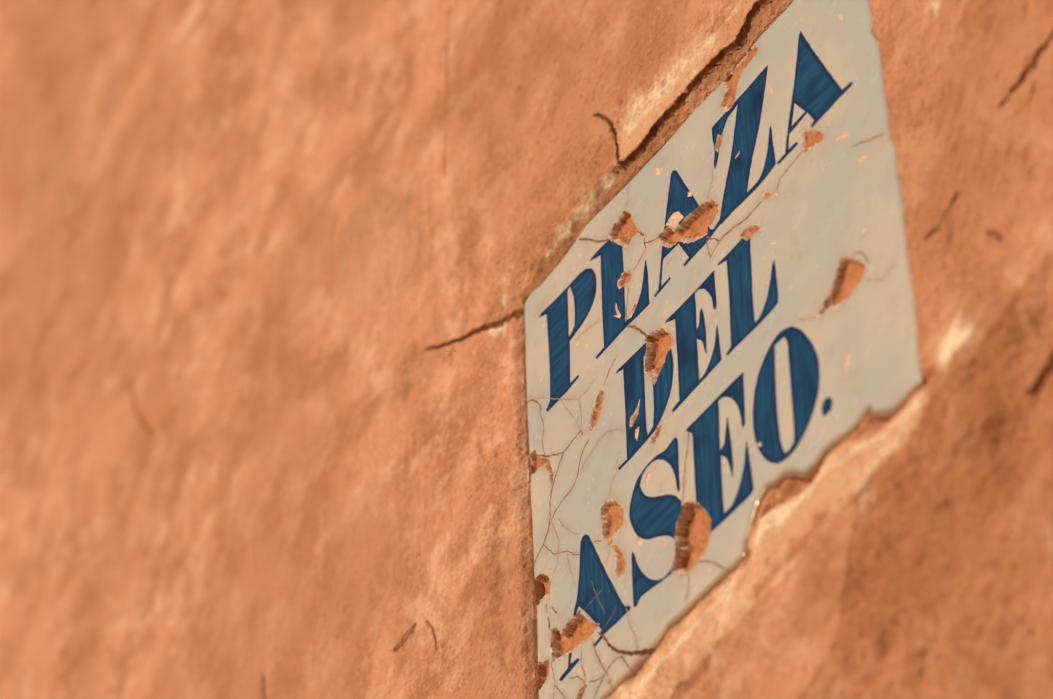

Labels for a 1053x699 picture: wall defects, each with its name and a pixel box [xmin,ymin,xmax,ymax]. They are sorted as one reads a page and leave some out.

spalling [517,0,794,305]
crack [594,0,771,207]
crack [706,150,803,258]
spalling [802,128,849,155]
crack [427,310,524,350]
crack [626,232,659,337]
spalling [644,326,674,384]
crack [527,358,656,699]
spalling [600,499,626,579]
spalling [661,501,711,576]
spalling [795,253,1053,699]
spalling [538,610,599,678]